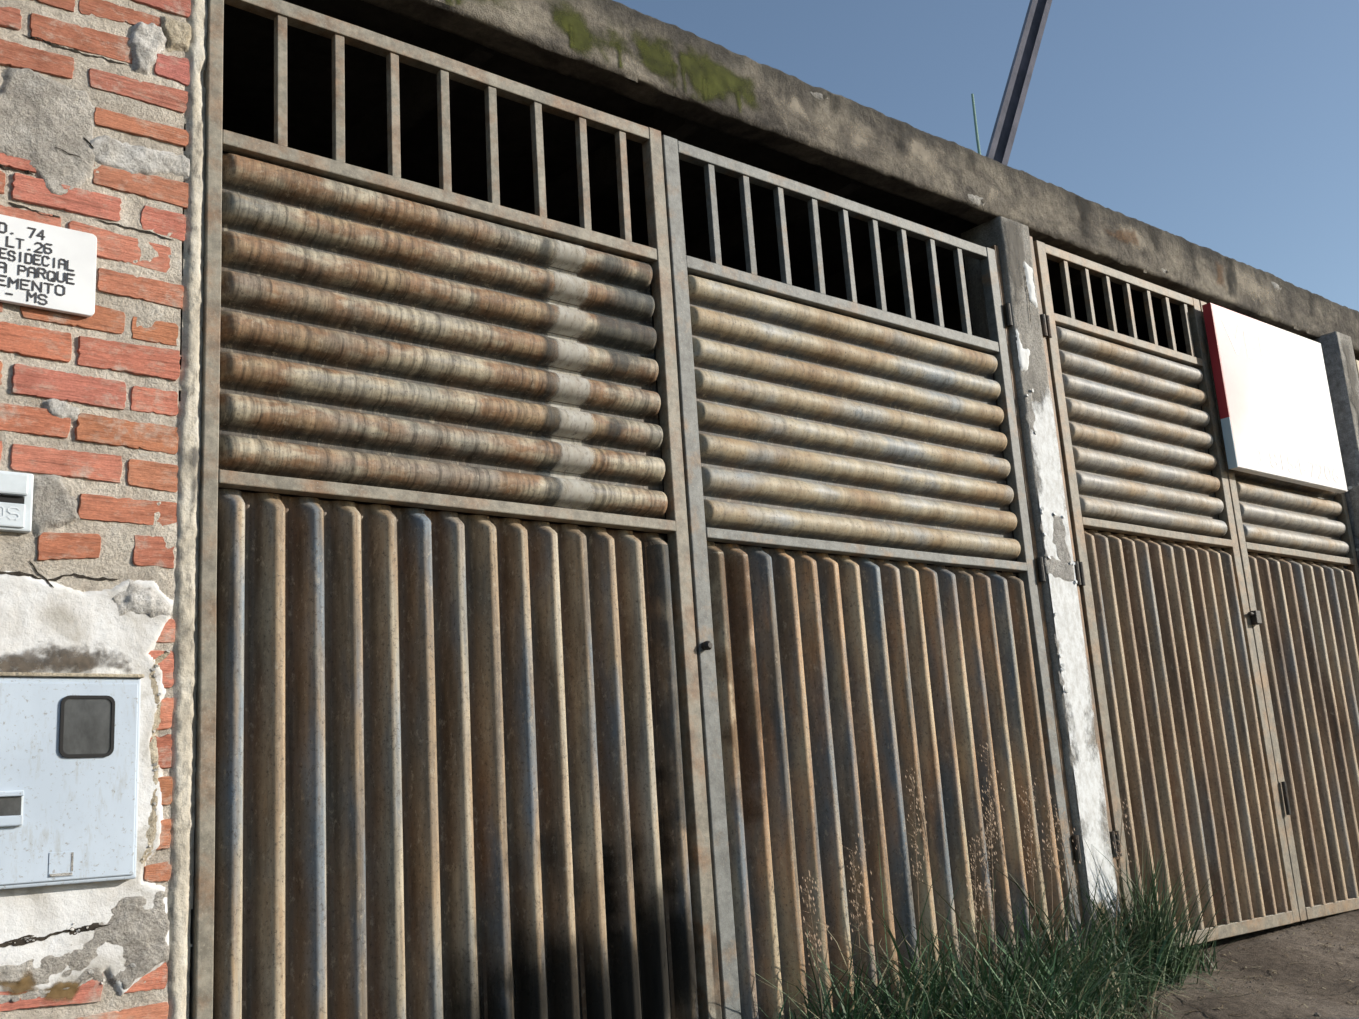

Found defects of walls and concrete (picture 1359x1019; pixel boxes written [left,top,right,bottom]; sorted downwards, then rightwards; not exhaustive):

peeling [1040,507,1077,584]
crack [0,561,118,588]
spalling [139,650,171,866]
crack [0,924,110,947]
spalling [69,923,99,935]
spalling [0,952,149,1004]